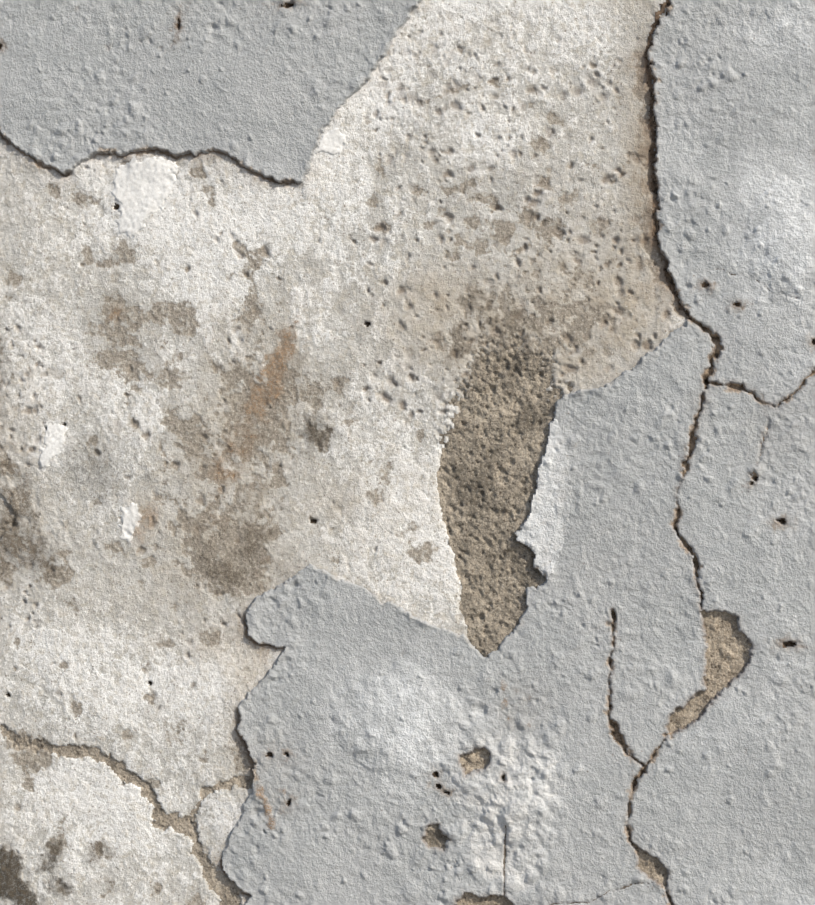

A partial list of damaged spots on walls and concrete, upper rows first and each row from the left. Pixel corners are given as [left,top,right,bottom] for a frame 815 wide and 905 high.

peeling [313,128,346,155]
peeling [111,156,178,237]
crack [645,0,815,476]
peeling [39,423,68,468]
peeling [118,502,142,542]
spalling [436,336,574,657]
crack [672,509,706,613]
crack [609,609,617,632]
spalling [667,611,751,733]
crack [607,658,672,852]
peeling [0,724,253,905]
crack [550,882,673,905]